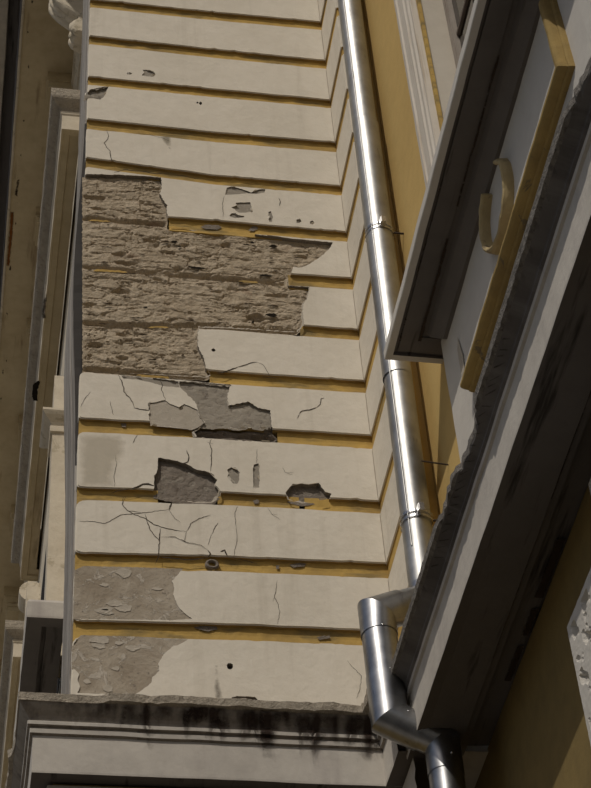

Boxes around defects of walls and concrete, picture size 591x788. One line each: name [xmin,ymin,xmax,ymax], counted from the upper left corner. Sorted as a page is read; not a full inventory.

flaking render [82,177,331,442]
crack [110,375,166,415]
crack [83,455,256,564]
flaking render [153,461,221,505]
peeling [227,467,239,484]
flaking render [286,483,330,506]
peeling [73,566,218,631]
peeling [71,635,188,694]
damp [183,707,226,730]
damp [240,710,372,755]